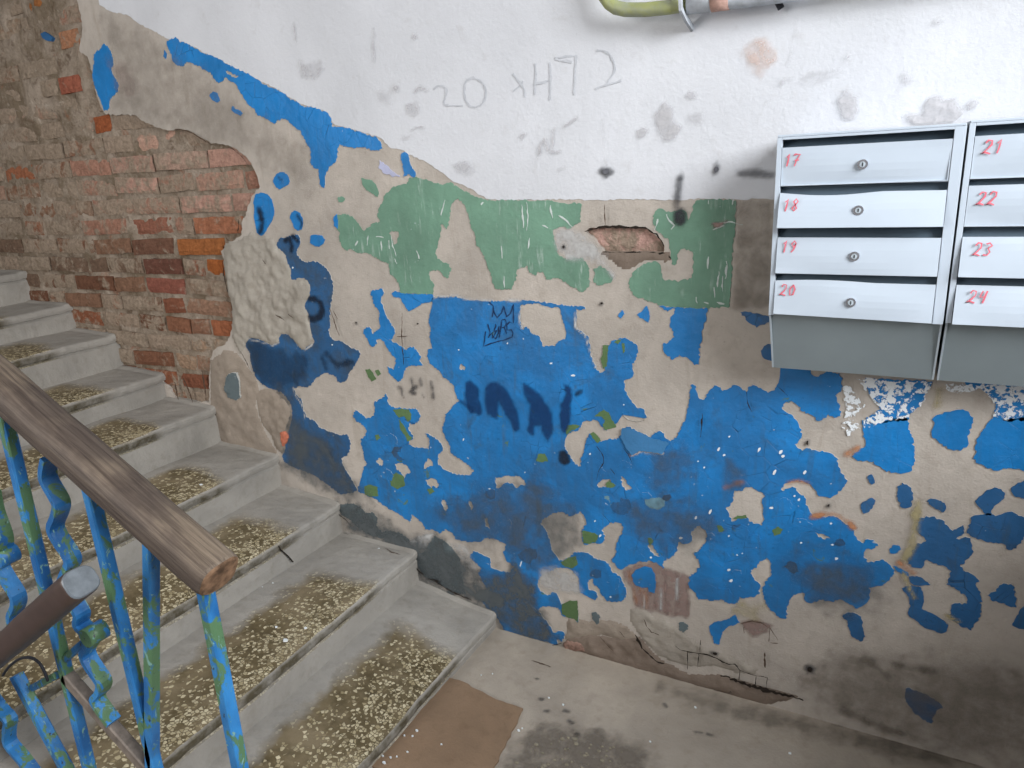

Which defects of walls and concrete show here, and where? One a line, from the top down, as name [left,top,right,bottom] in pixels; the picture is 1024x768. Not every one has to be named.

peeling [0,0,948,634]
peeling [931,382,1024,471]
peeling [907,481,1024,631]
crack [600,620,803,701]